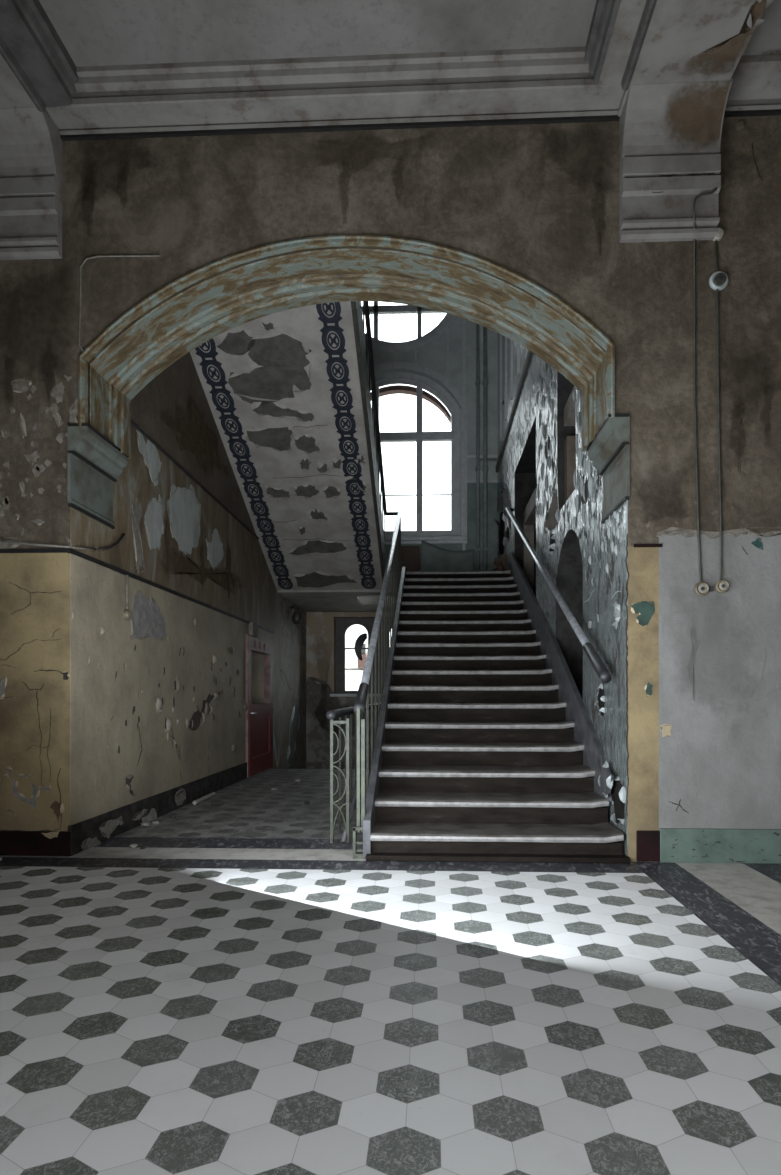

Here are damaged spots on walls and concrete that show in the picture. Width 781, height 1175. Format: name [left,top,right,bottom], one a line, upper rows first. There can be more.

peeling [0,406,67,549]
crack [9,582,61,614]
peeling [45,375,78,444]
peeling [132,426,224,574]
peeling [215,318,368,556]
peeling [294,571,358,588]
spalling [495,510,509,558]
peeling [536,364,558,555]
peeling [572,388,619,585]
peeling [587,600,655,629]
crack [0,628,63,831]
peeling [125,647,248,756]